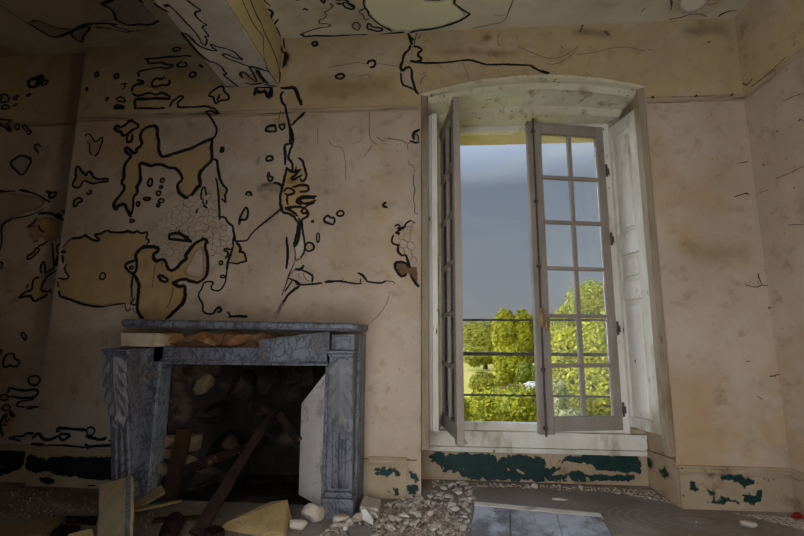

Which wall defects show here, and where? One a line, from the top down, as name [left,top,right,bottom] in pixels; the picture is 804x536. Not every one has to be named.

peeling [336,0,471,95]
crack [328,0,651,85]
peeling [0,0,278,320]
crack [152,158,280,318]
crack [281,218,306,303]
peeling [391,220,419,287]
peeling [0,375,111,486]
peeling [375,466,419,498]
peeling [428,449,675,482]
peeling [683,474,774,505]